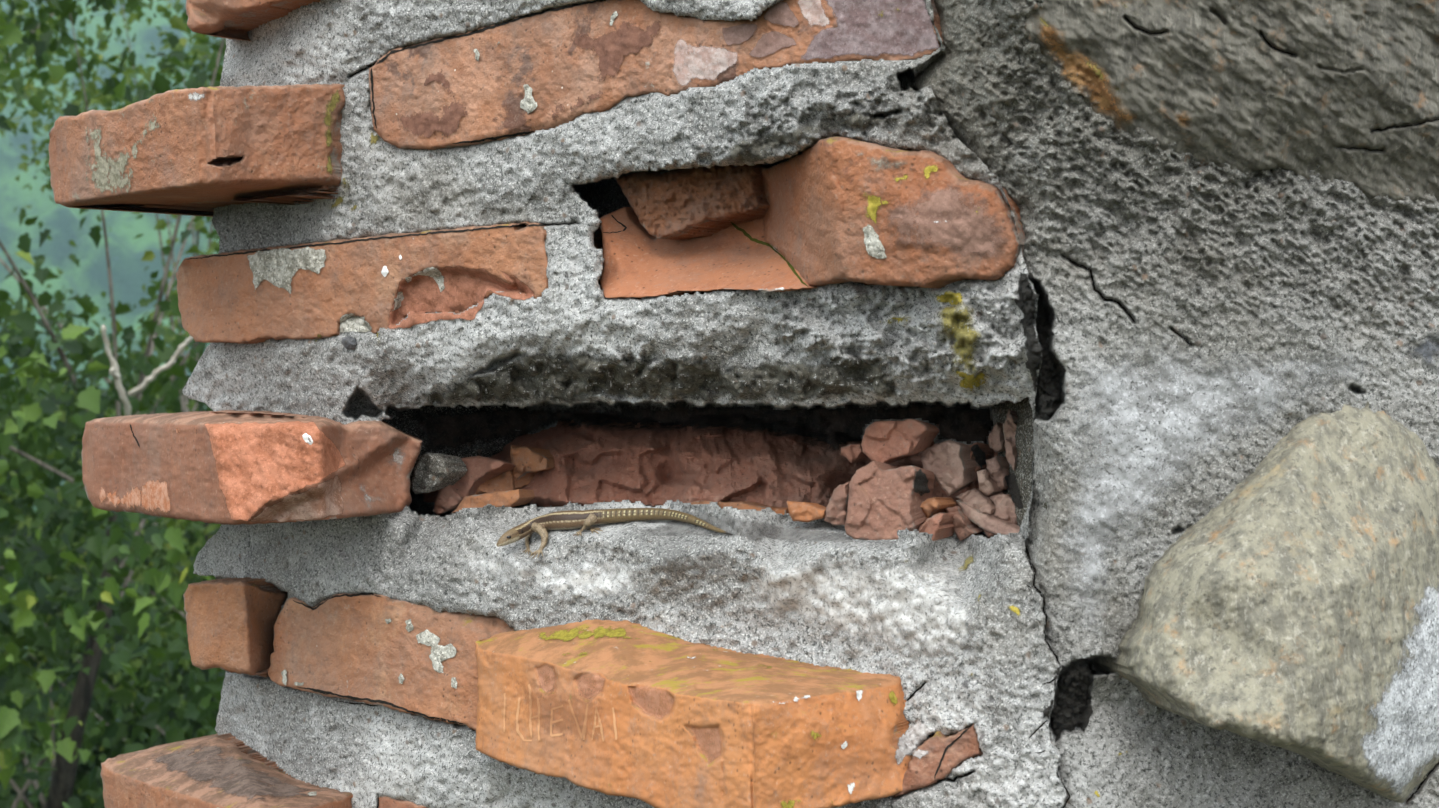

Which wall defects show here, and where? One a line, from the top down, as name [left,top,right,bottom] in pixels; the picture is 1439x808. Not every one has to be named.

crack [1125,17,1167,34]
crack [1261,33,1296,55]
crack [1339,119,1439,151]
spalling [599,111,892,299]
crack [1063,256,1135,322]
crack [1024,538,1060,684]
crack [1029,720,1070,808]